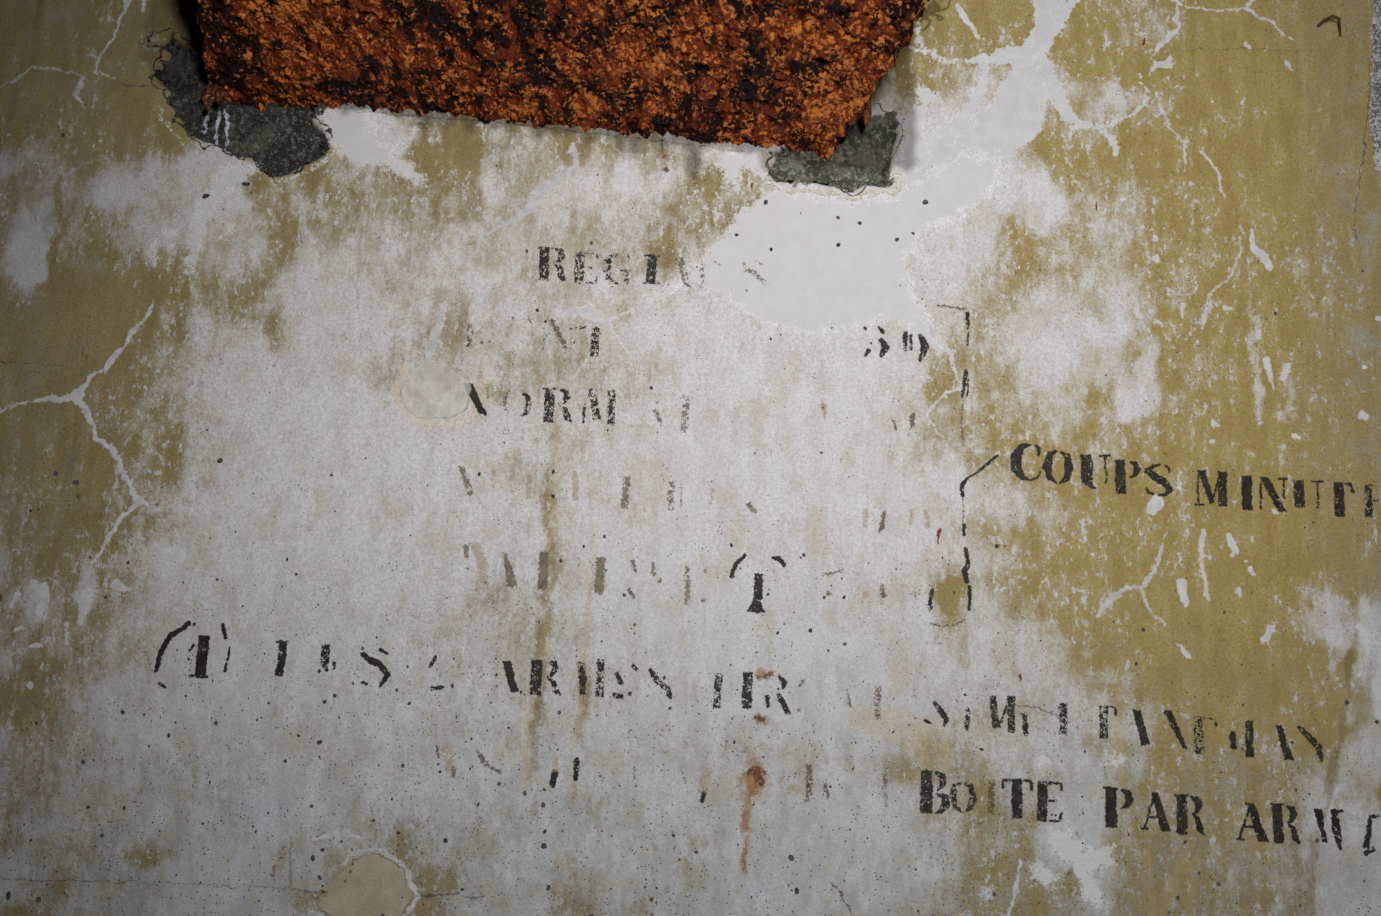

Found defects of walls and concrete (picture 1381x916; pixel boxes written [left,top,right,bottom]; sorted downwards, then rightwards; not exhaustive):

crack [955,3,980,40]
corrosion [202,84,227,111]
corrosion [862,94,872,127]
crack [1149,0,1314,198]
spalling [145,27,432,276]
crack [1200,236,1243,330]
crack [0,301,194,565]
corrosion [755,667,775,681]
corrosion [753,714,769,726]
corrosion [740,758,770,874]
crack [830,882,852,915]
crack [1005,859,1023,916]